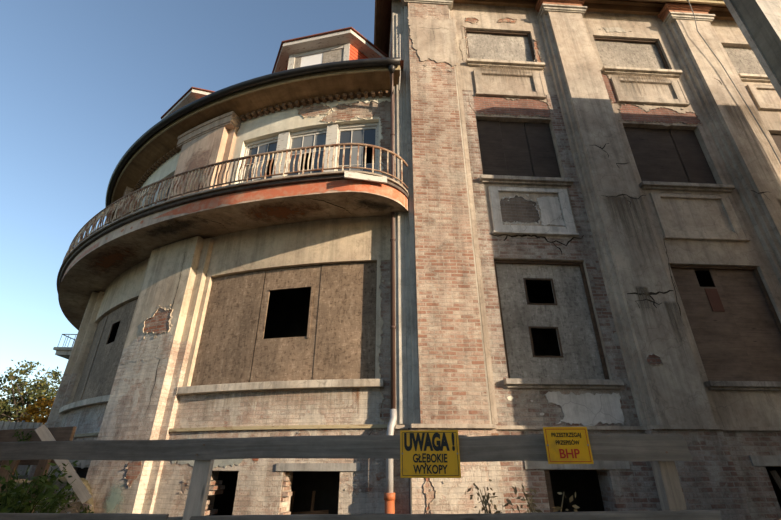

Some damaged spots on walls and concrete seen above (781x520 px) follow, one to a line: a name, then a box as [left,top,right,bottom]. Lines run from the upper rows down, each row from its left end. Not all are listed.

flaking render [407,17,479,72]
peeling [153,100,409,219]
flaking render [500,194,565,226]
crack [491,234,584,254]
crack [627,236,684,325]
flaking render [143,304,173,339]
flaking render [545,391,624,426]
flaking render [422,478,436,514]